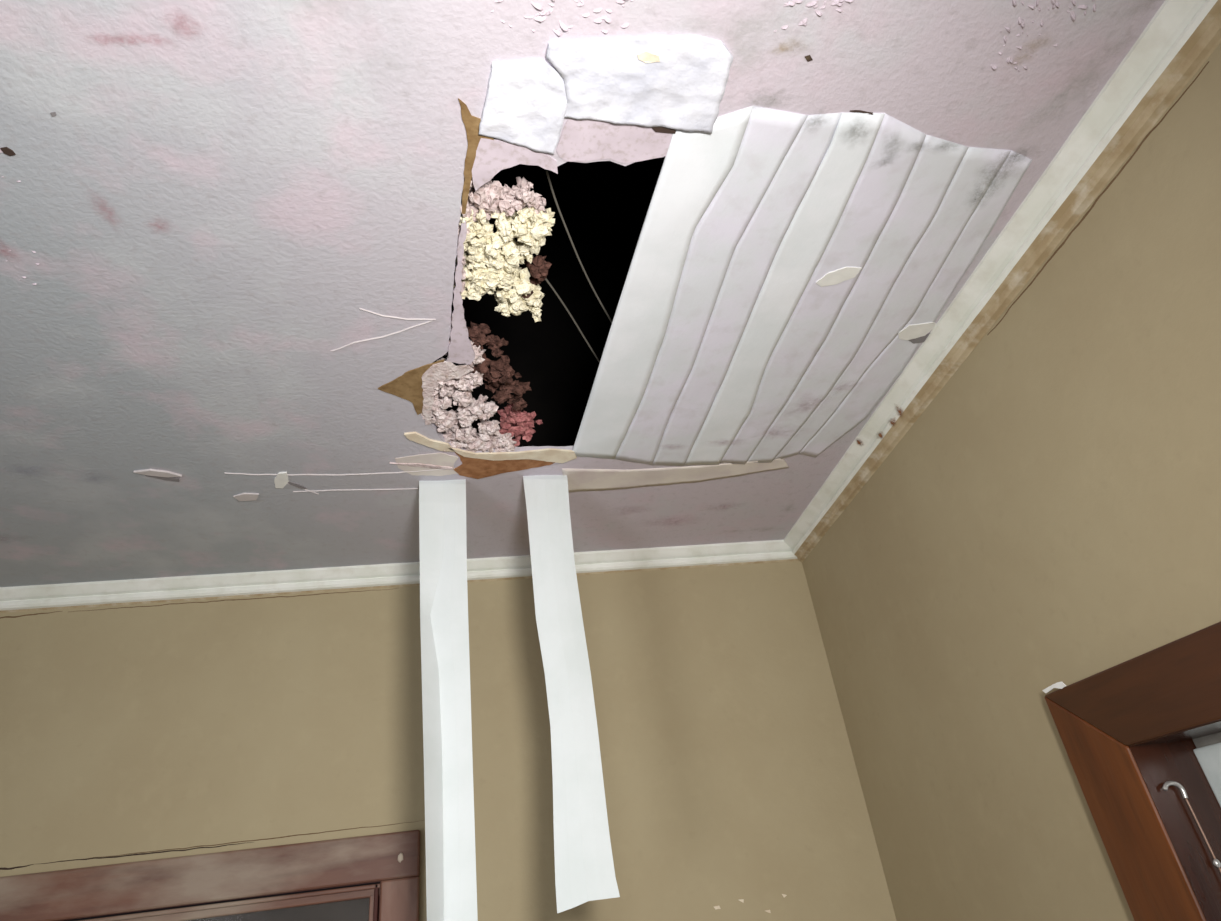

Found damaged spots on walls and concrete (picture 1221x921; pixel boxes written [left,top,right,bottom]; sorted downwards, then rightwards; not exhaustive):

spalling [378,98,676,479]